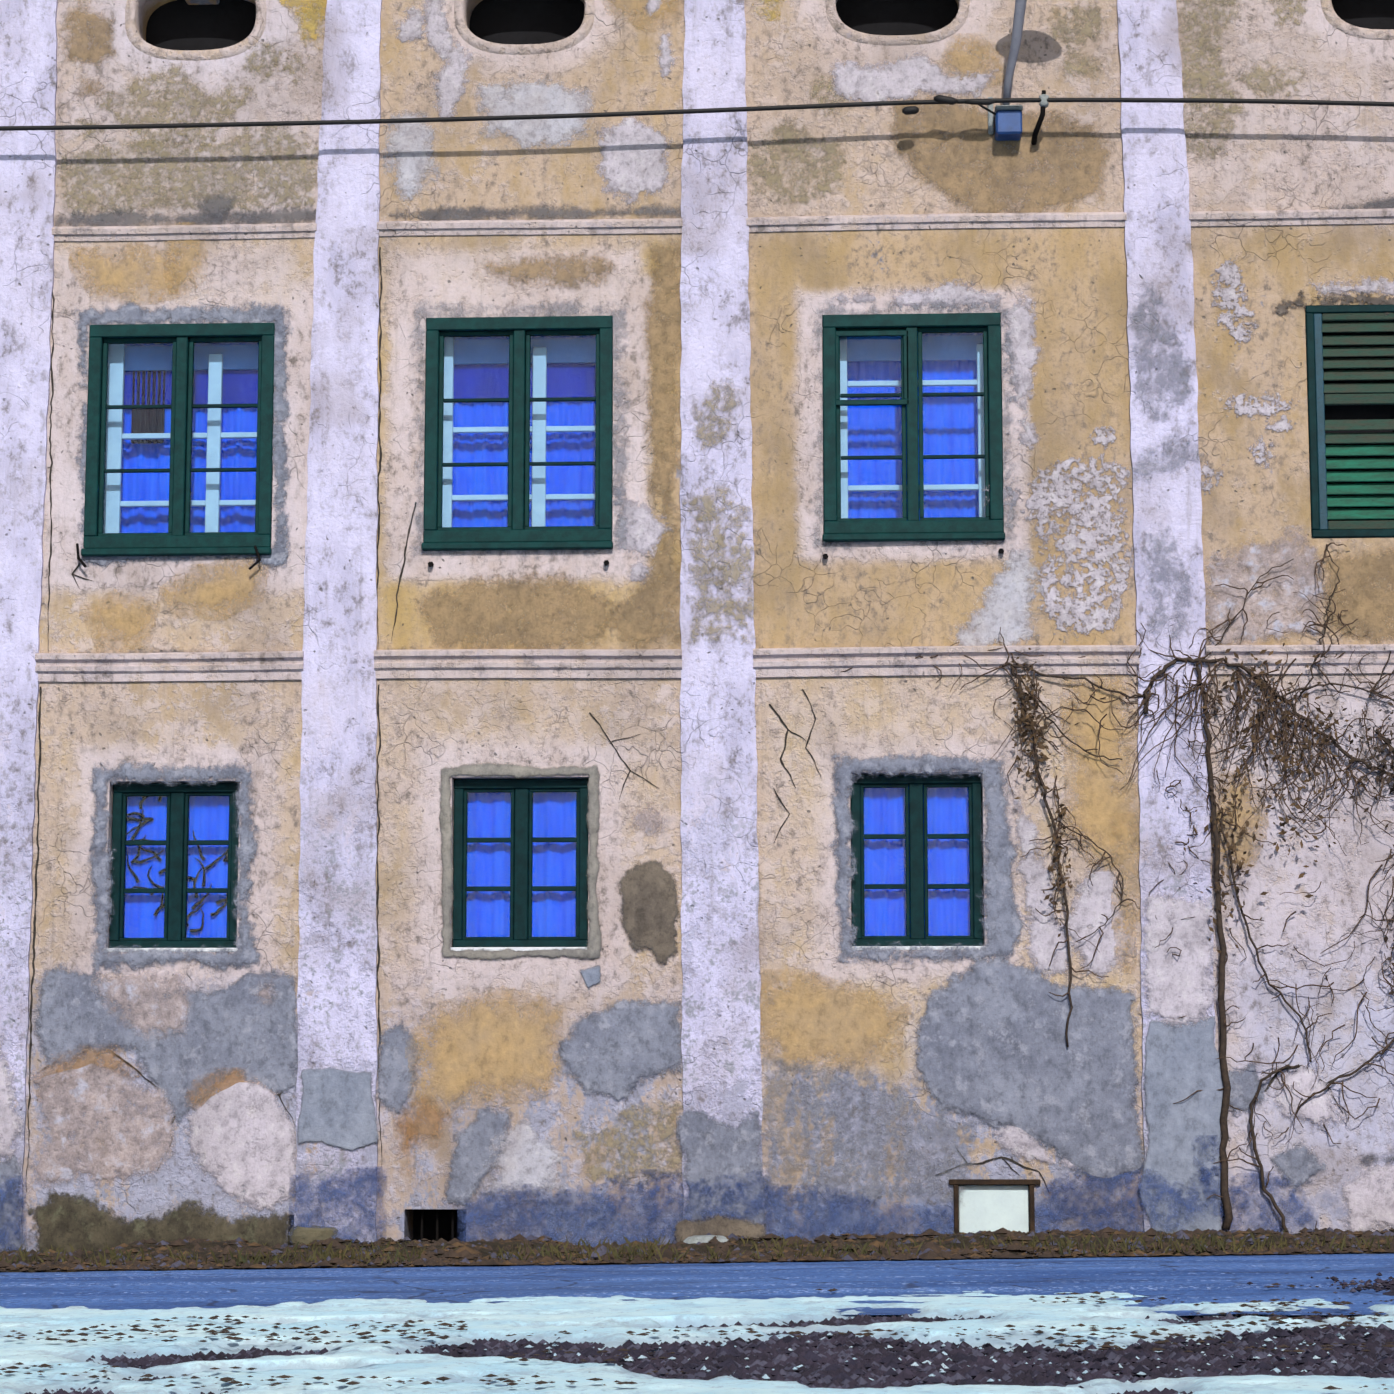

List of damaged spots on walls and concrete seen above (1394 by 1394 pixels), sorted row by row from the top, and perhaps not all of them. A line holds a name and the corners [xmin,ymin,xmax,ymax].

peeling [384,0,669,204]
peeling [1209,258,1259,349]
flaking render [1275,276,1394,316]
peeling [893,282,1041,449]
peeling [1221,391,1299,468]
peeling [957,426,1134,646]
crack [589,712,658,800]
crack [769,689,821,842]
flaking render [619,860,679,966]
flaking render [98,971,188,1034]
peeling [488,1120,563,1198]
peeling [993,1125,1076,1168]